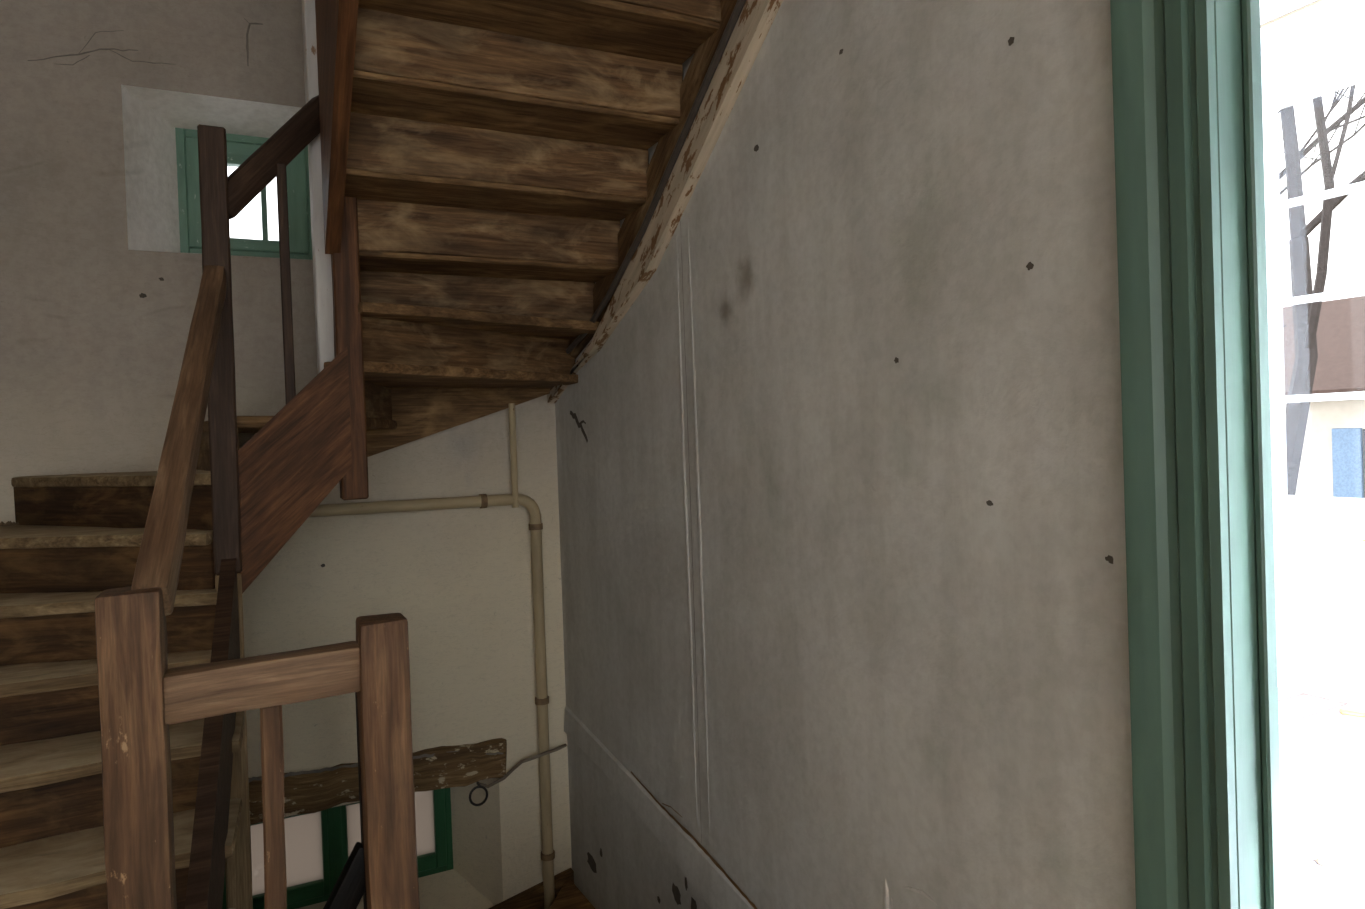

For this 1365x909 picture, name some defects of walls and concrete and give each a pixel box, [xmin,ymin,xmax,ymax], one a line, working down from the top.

crack [28,30,176,65]